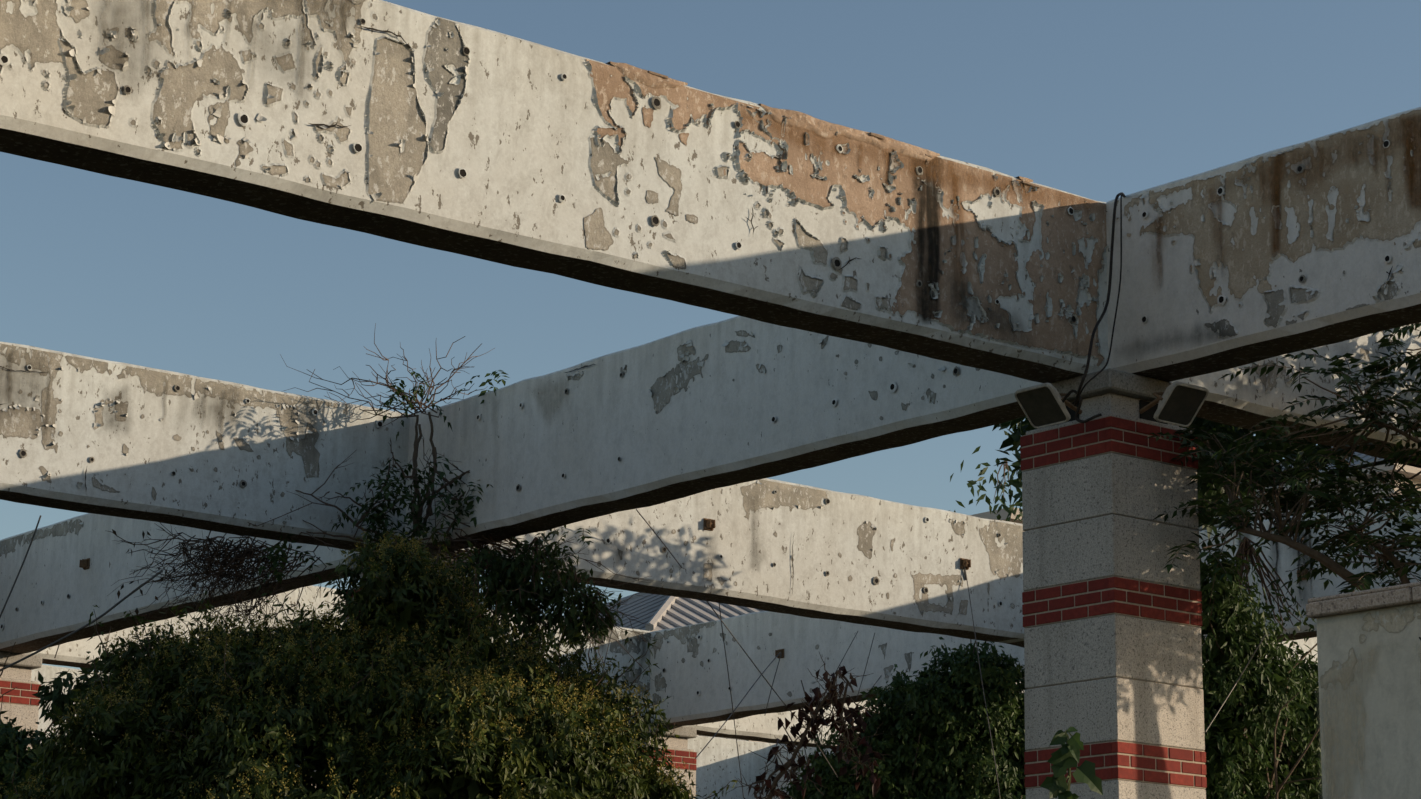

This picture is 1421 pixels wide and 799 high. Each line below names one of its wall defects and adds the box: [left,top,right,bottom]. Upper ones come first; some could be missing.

peeling [0,0,471,204]
peeling [584,59,1421,366]
corrosion [1272,156,1282,251]
corrosion [1403,118,1421,205]
peeling [649,330,766,414]
peeling [901,366,946,411]
peeling [0,519,83,558]
peeling [703,563,737,586]
peeling [740,479,827,520]
peeling [857,520,894,559]
peeling [886,571,968,617]
peeling [949,519,1024,611]